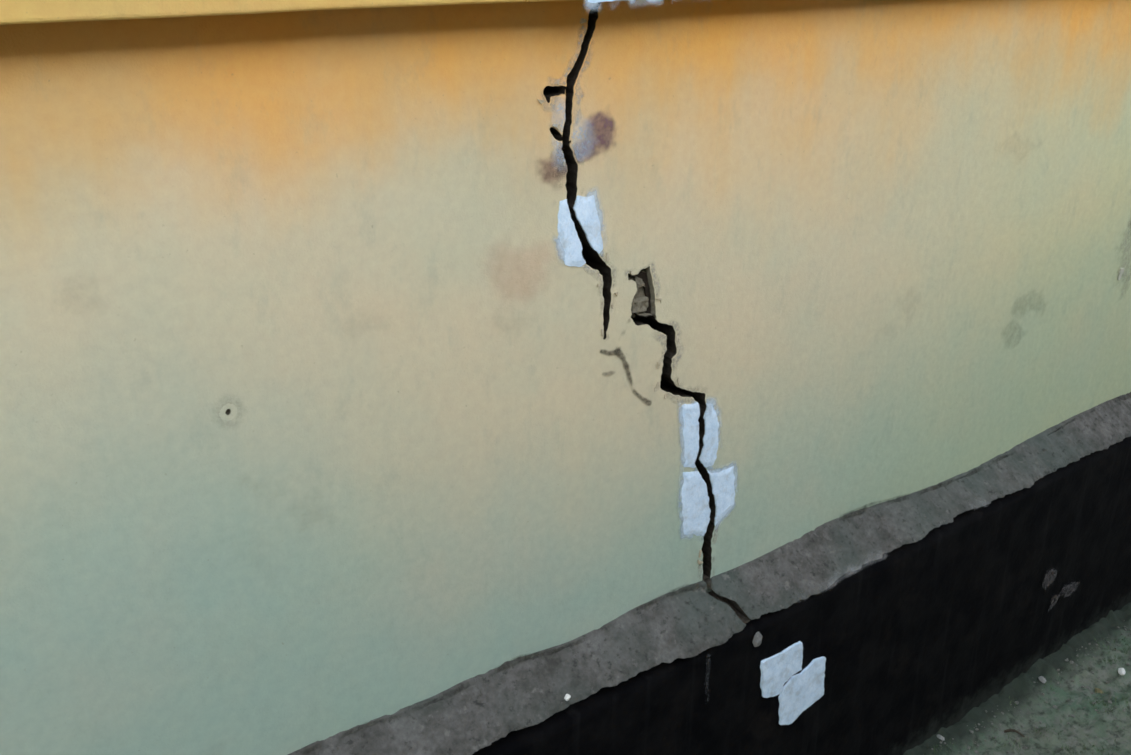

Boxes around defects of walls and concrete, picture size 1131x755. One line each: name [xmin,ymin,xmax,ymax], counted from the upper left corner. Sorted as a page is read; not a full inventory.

damp [559,113,614,172]
crack [538,2,750,623]
spalling [1042,568,1079,610]